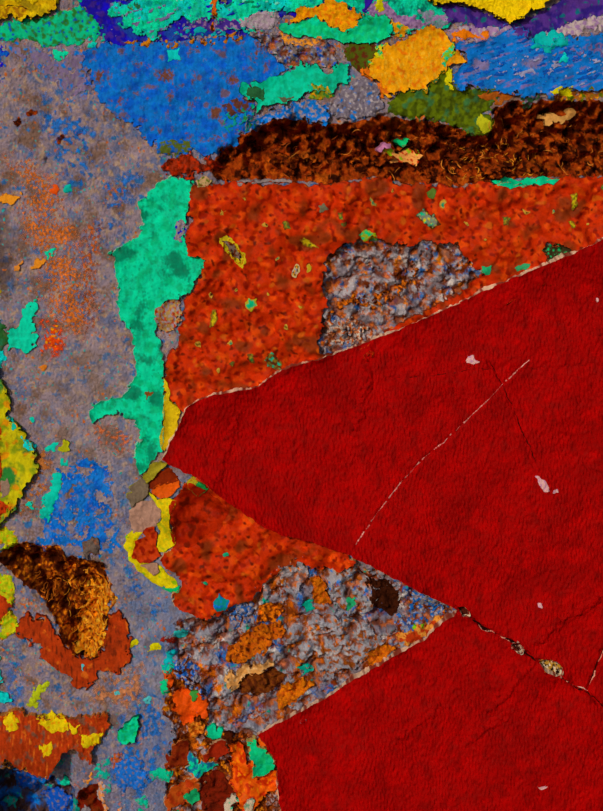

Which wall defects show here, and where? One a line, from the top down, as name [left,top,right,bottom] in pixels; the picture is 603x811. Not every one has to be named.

crack [395,363,536,462]
crack [469,616,603,706]